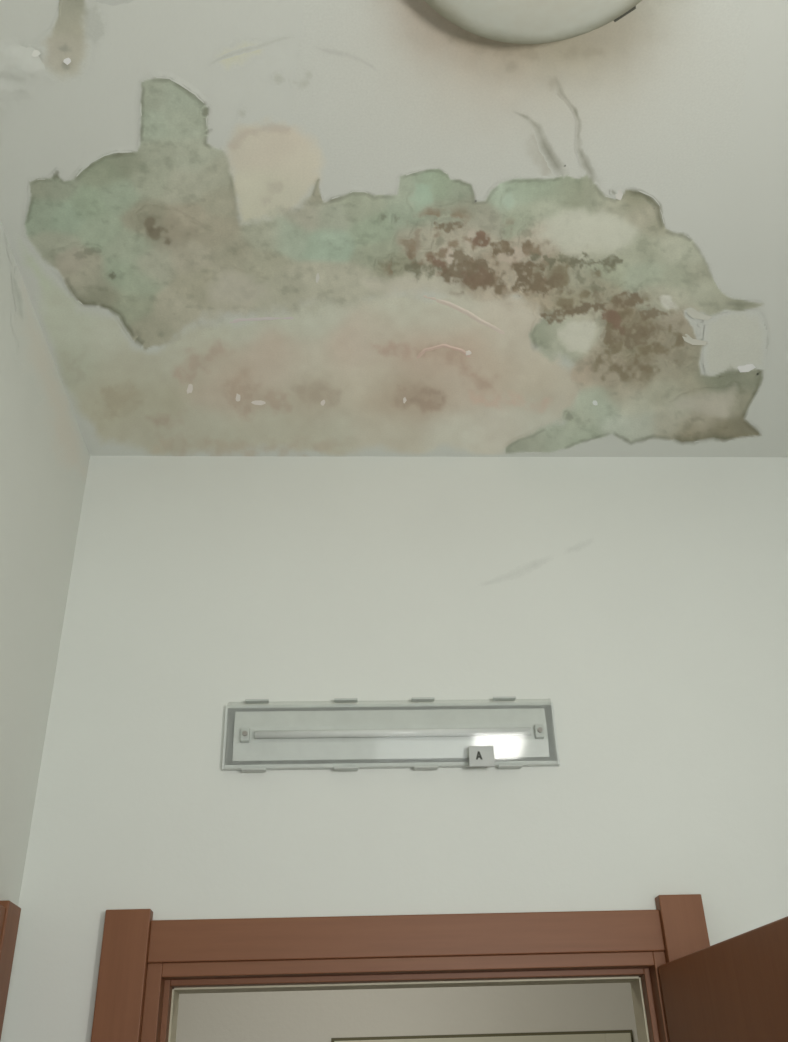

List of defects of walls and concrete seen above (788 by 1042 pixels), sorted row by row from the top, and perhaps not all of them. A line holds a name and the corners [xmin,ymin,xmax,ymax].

peeling [16,0,133,86]
leakage [218,112,333,218]
crack [511,74,605,192]
leakage [131,205,209,262]
peeling [20,71,770,457]
leakage [4,221,573,485]